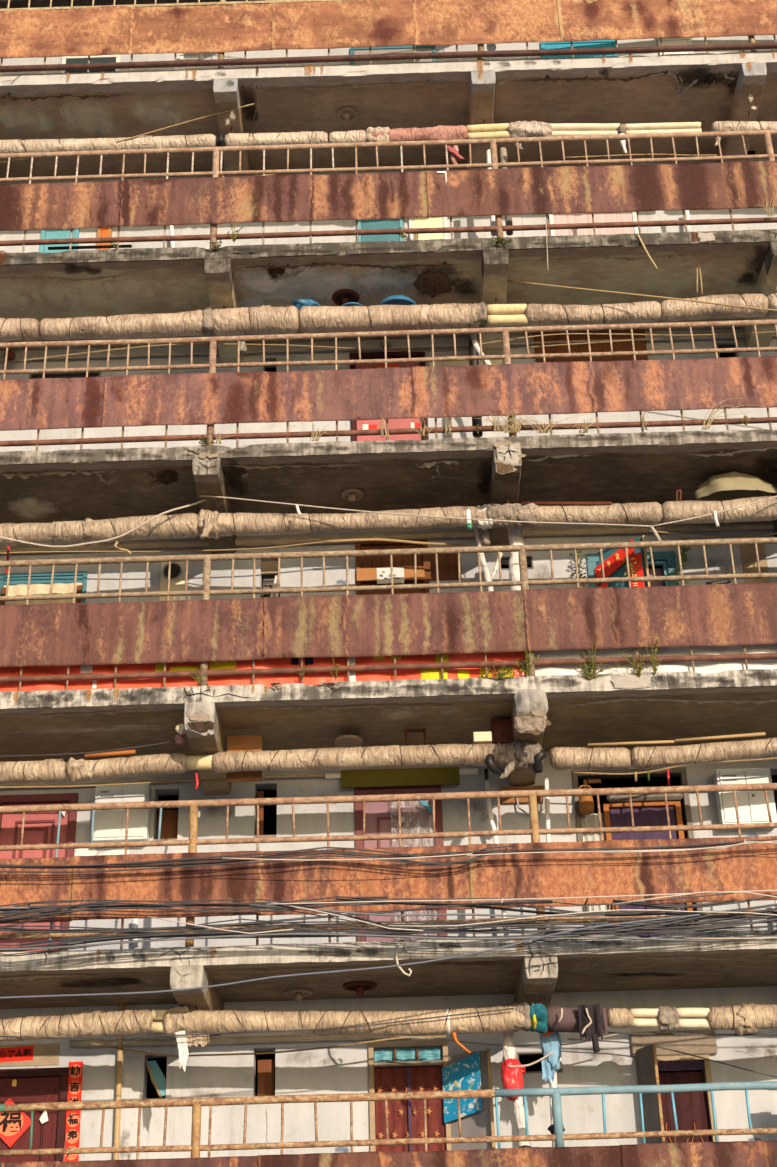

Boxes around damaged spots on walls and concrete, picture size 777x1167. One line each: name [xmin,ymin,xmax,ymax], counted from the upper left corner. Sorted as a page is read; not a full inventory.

spalling [494,440,592,474]
crack [516,939,579,976]